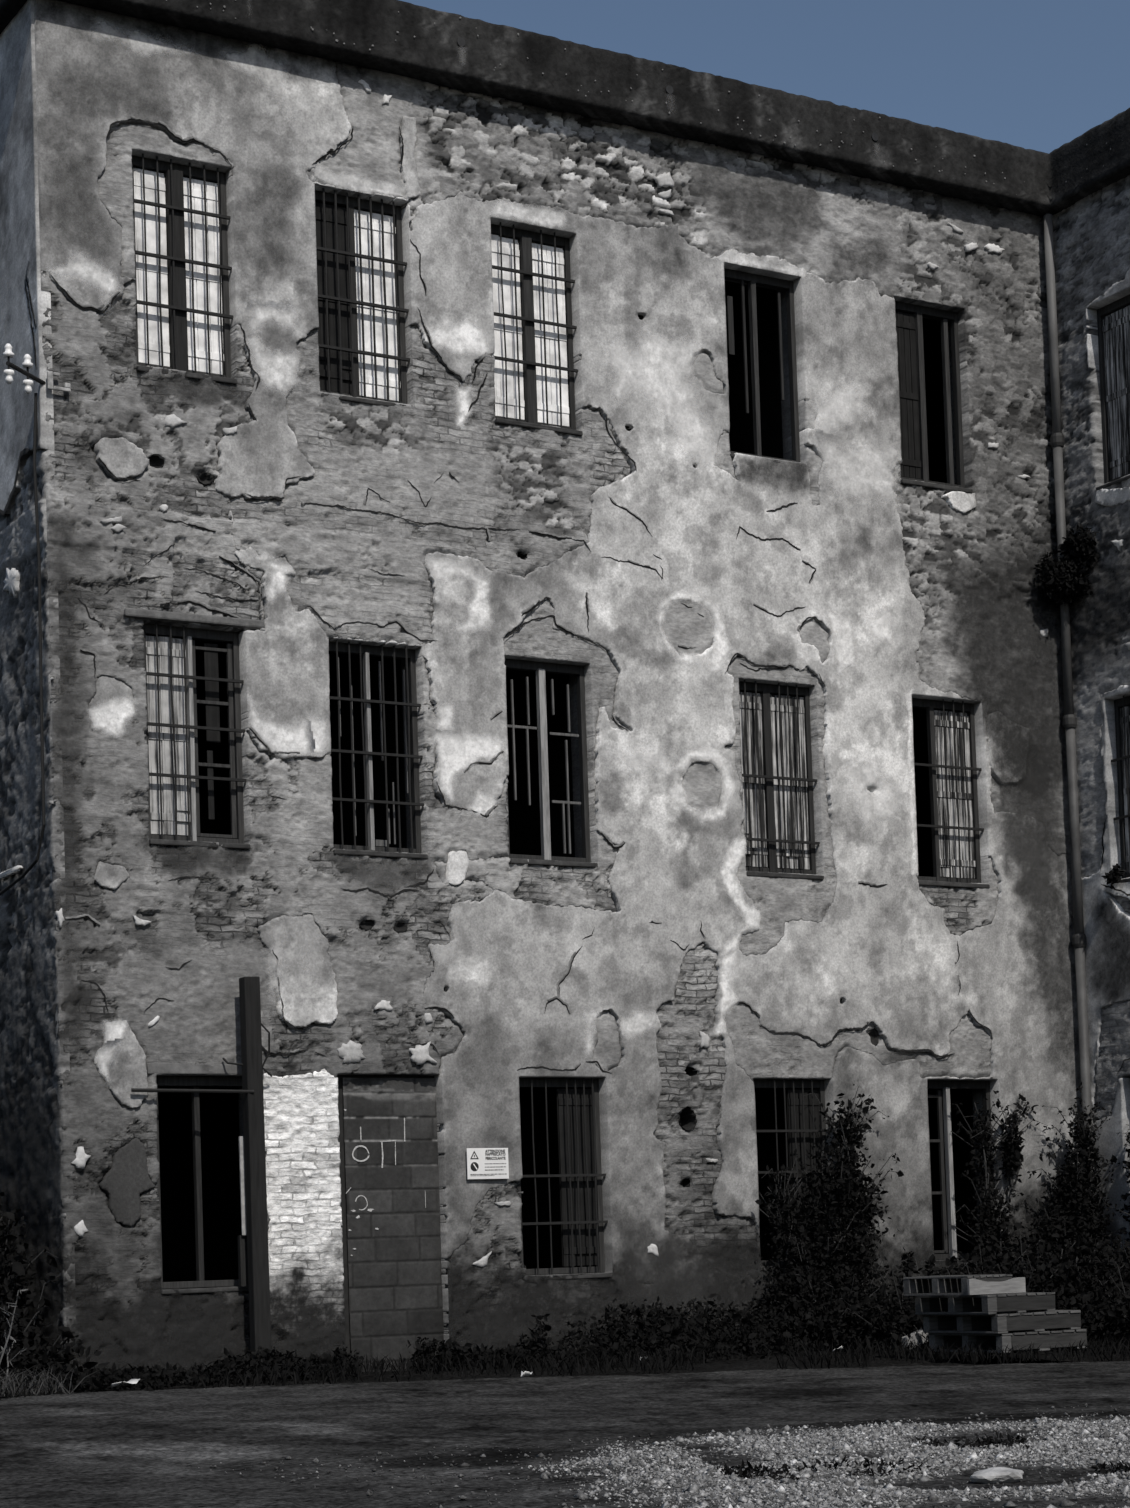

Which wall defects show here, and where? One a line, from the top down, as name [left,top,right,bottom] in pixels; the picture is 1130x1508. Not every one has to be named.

crack [606,414,637,471]
crack [245,471,704,651]
flaking render [307,62,1130,956]
crack [725,502,826,687]
flaking render [0,123,632,1373]
crack [168,874,222,882]
crack [544,927,595,1014]
flaking render [648,943,992,1260]
crack [737,1001,955,1057]
crack [955,941,993,1039]
flaking render [1092,1000,1130,1123]